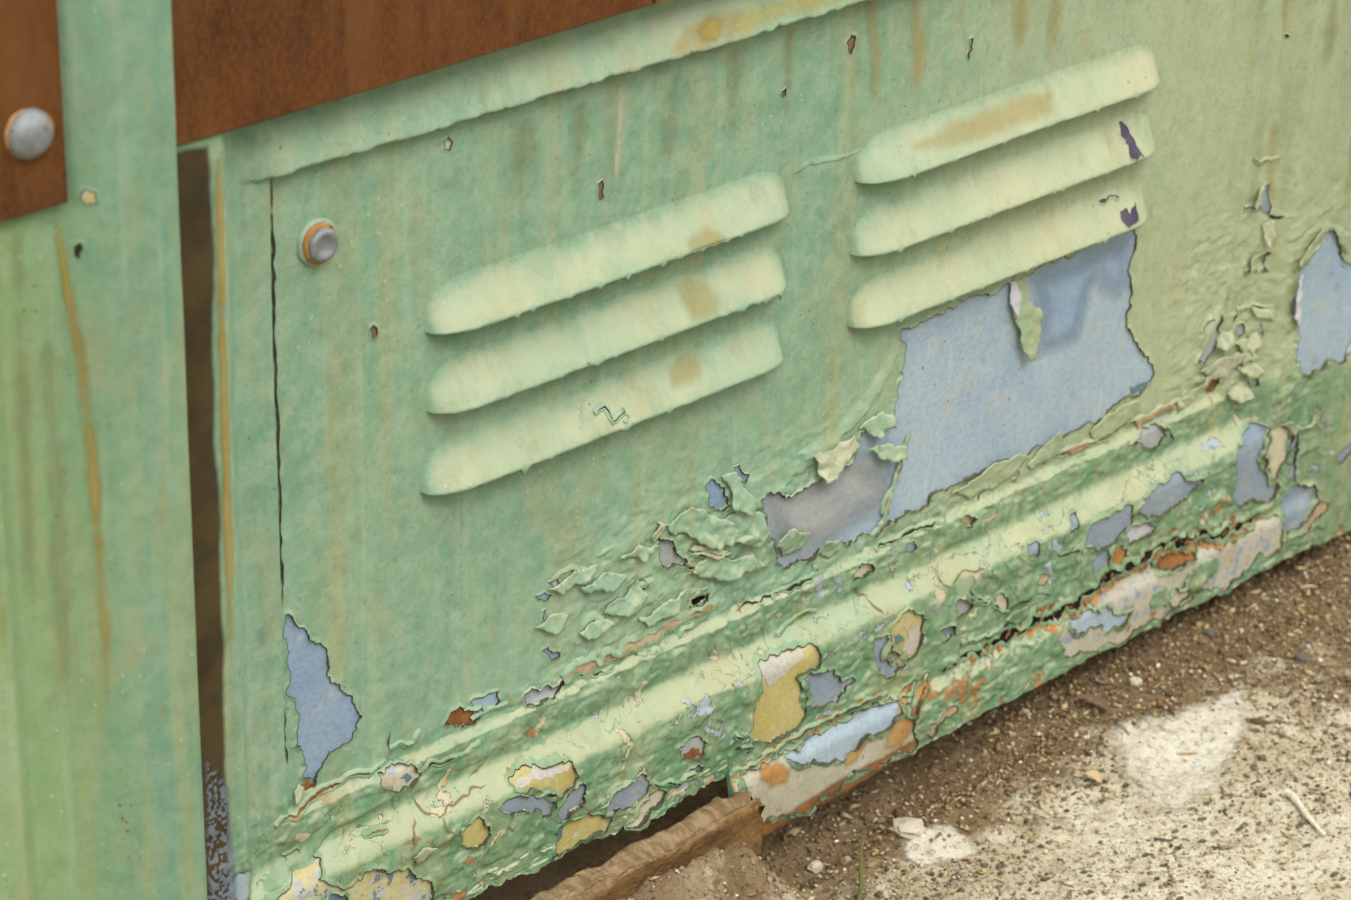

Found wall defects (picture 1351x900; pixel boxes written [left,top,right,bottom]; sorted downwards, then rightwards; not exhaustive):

corrosion [0,0,68,222]
corrosion [58,232,85,399]
peeling [1193,222,1351,404]
corrosion [87,425,101,559]
corrosion [171,0,667,900]
peeling [533,191,1169,664]
corrosion [1055,511,1287,663]
peeling [281,607,363,806]
peeling [207,759,438,900]
peeling [457,752,669,861]
peeling [743,640,857,749]
corrosion [736,672,932,835]